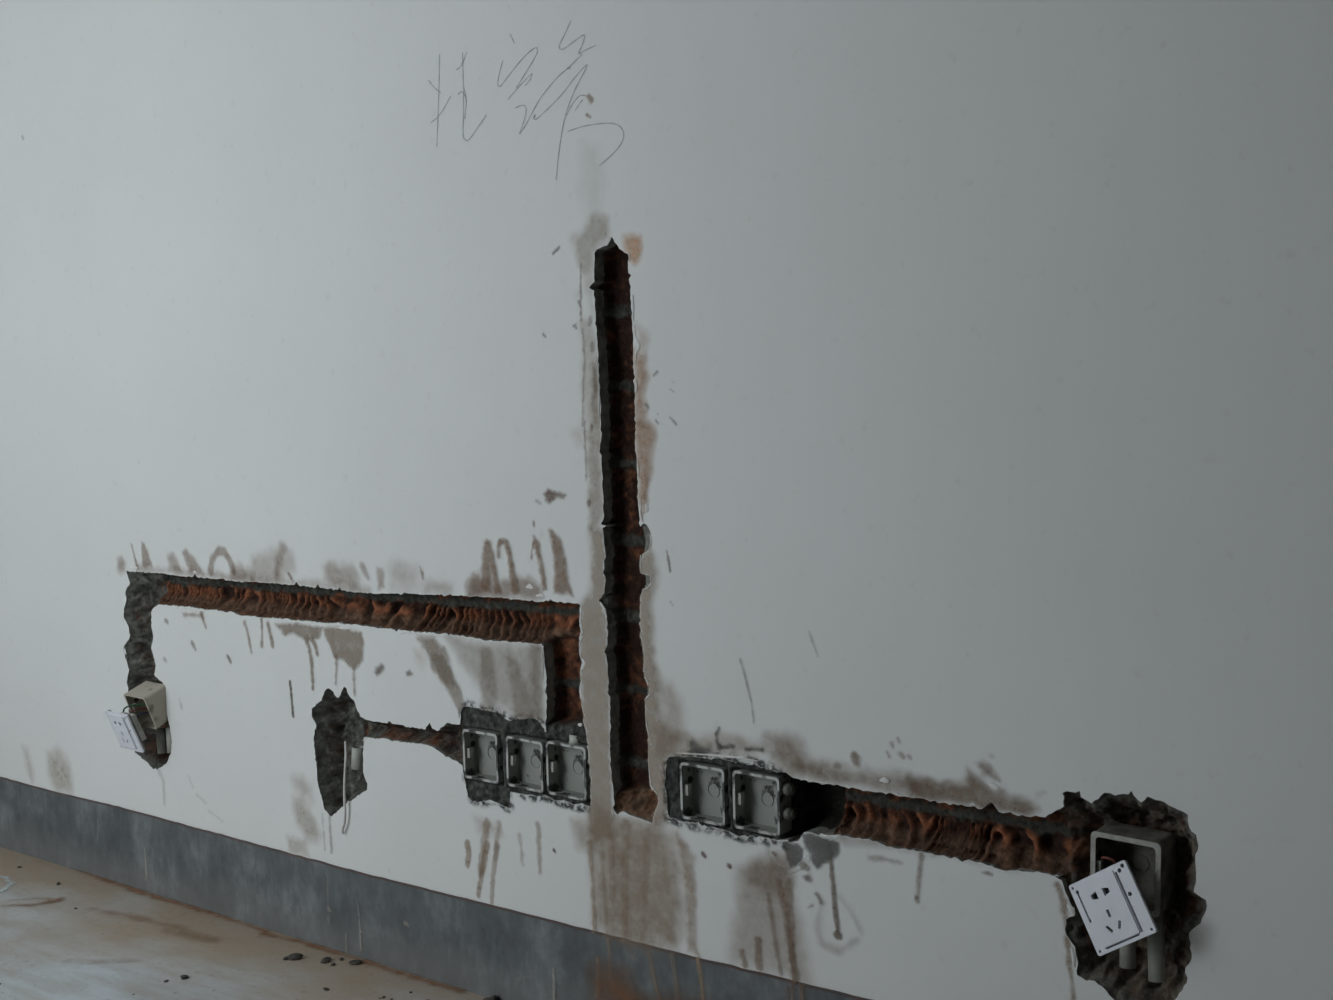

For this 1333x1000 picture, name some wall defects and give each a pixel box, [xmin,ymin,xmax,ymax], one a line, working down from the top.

damp [473,531,571,595]
hole [1058,791,1207,1000]